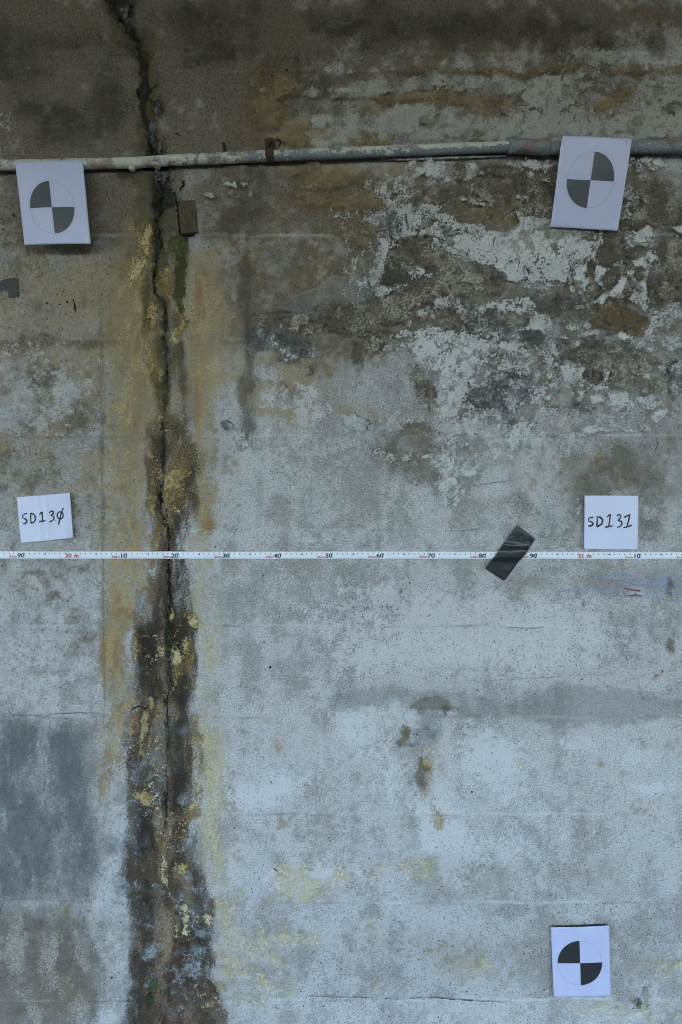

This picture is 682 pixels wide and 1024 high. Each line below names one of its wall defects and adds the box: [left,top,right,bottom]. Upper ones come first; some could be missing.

crack [114,0,198,829]
damp [0,218,320,1024]
peeling [238,154,682,548]